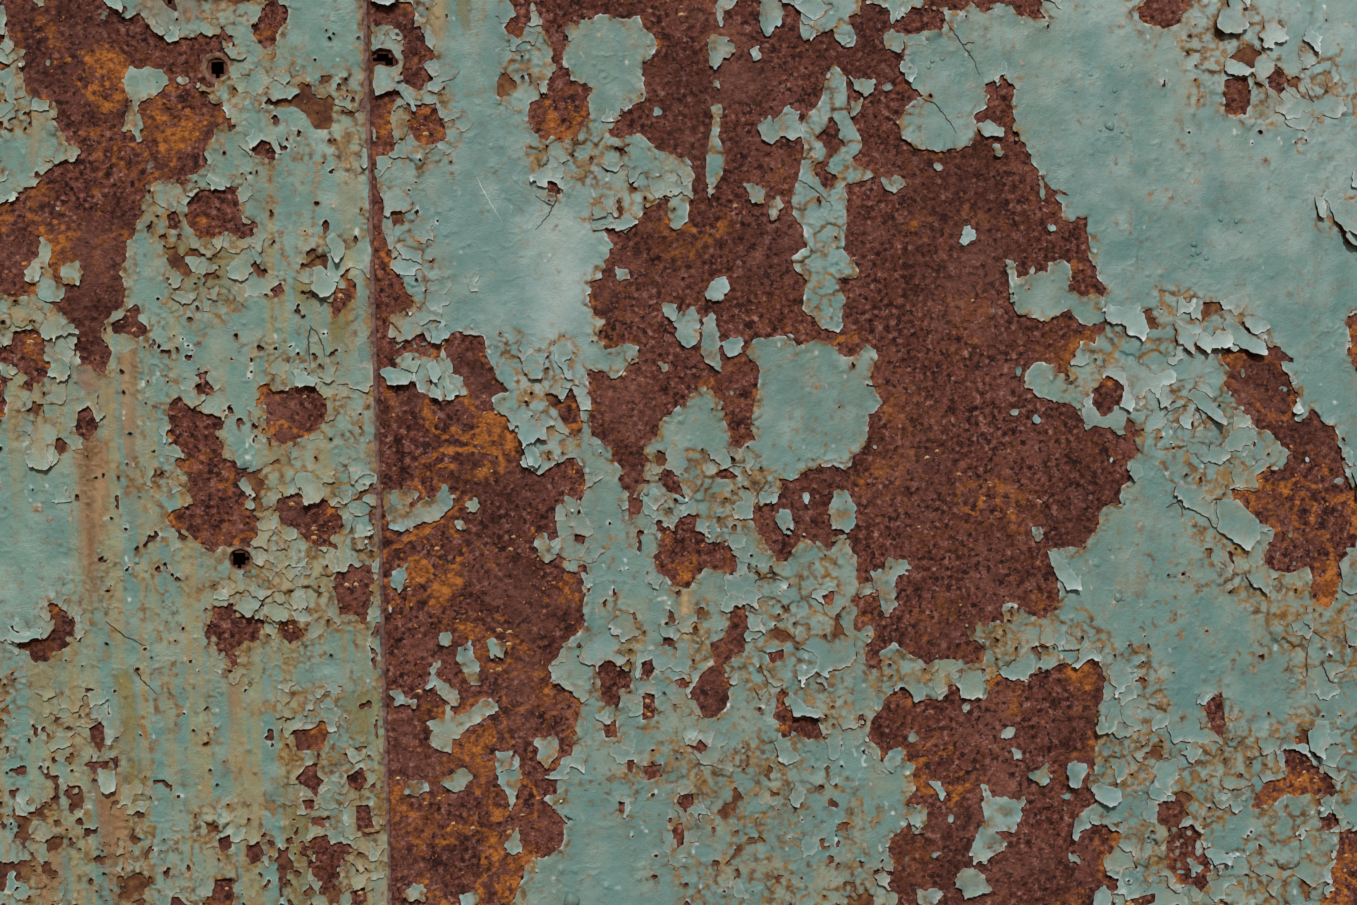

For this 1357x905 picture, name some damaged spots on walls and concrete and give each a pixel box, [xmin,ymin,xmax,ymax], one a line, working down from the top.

corrosion [0,0,287,459]
peeling [158,167,369,323]
peeling [232,43,481,344]
peeling [1213,0,1347,144]
corrosion [0,593,85,686]
peeling [213,456,377,639]
corrosion [159,0,1155,905]
peeling [1070,291,1281,596]
peeling [994,606,1357,905]
corrosion [1142,793,1233,902]
corrosion [1220,310,1357,614]
corrosion [1251,738,1357,905]